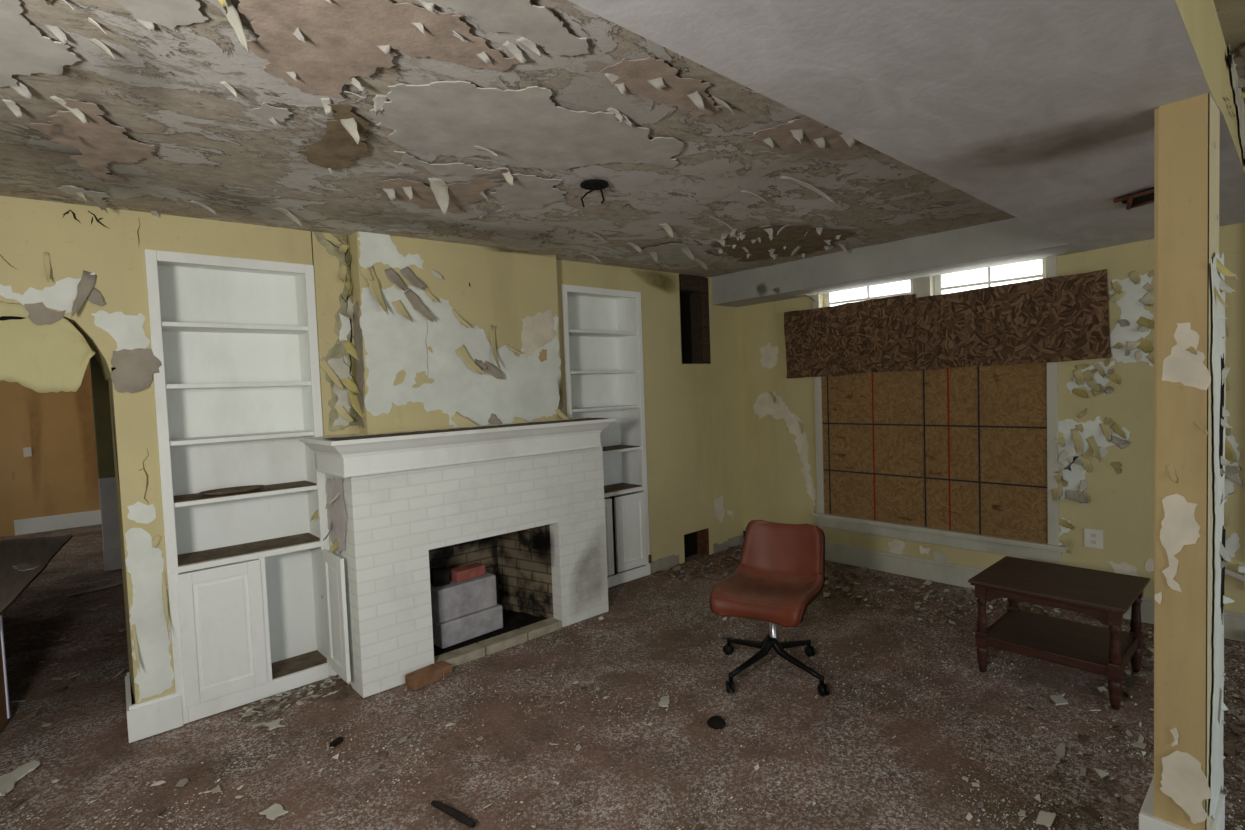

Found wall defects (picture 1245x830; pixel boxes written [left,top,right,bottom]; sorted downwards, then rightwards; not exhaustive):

peeling [0,0,159,213]
peeling [111,0,684,220]
peeling [749,116,884,160]
peeling [1228,45,1245,161]
peeling [0,252,162,393]
peeling [274,208,569,432]
peeling [626,217,856,273]
peeling [125,501,174,703]
peeling [753,391,816,511]
peeling [1051,252,1242,824]